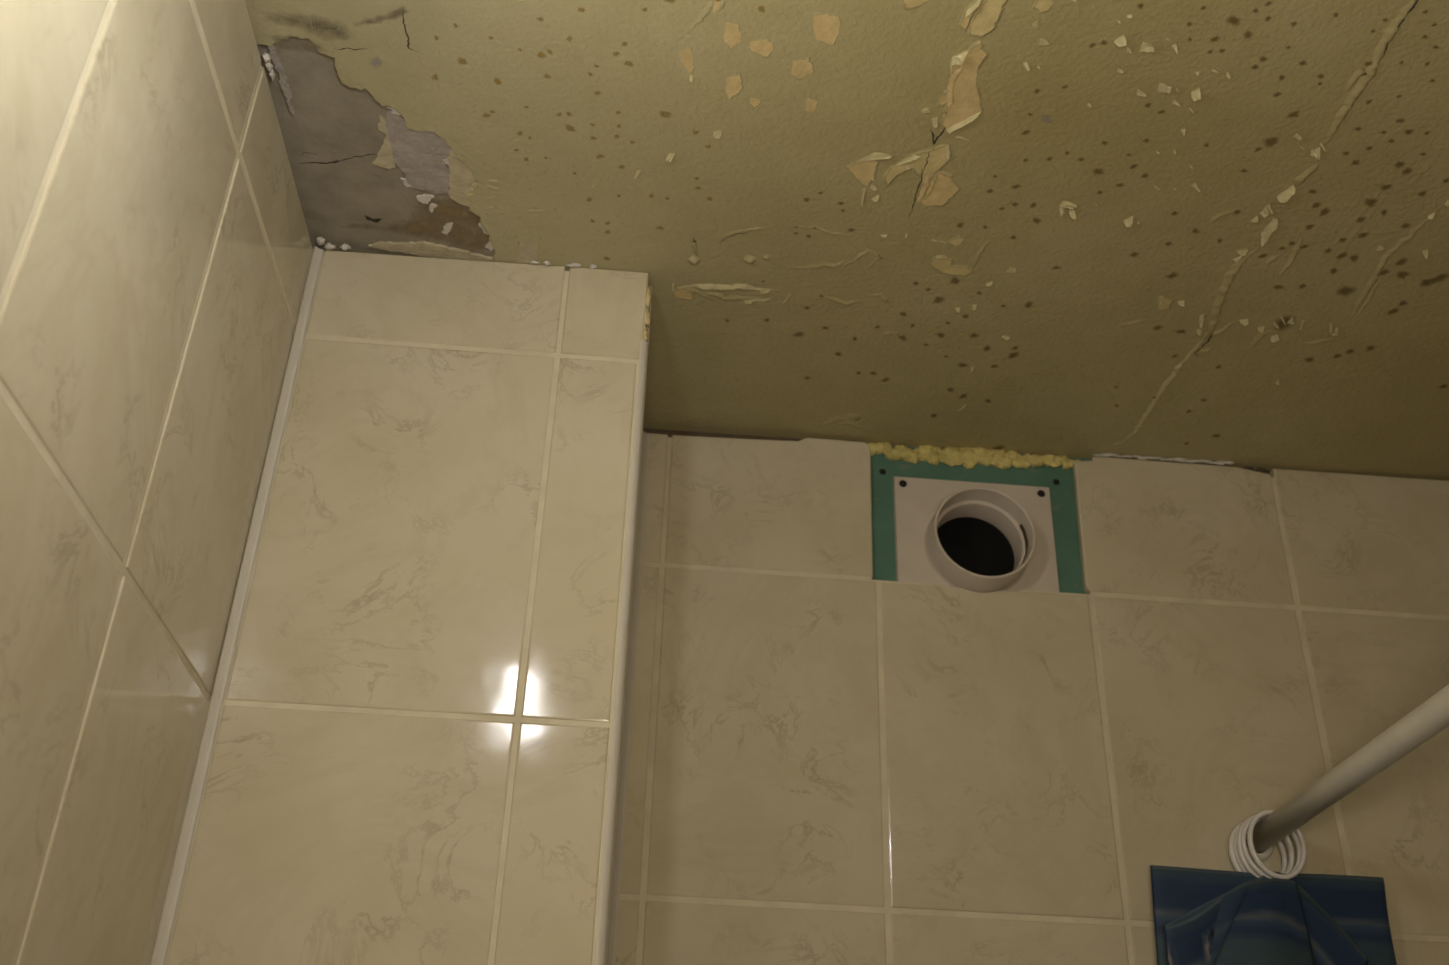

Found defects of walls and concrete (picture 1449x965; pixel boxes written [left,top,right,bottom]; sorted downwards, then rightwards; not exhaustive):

peeling [678,0,775,82]
peeling [810,12,842,45]
peeling [1114,14,1178,74]
peeling [846,0,1009,207]
peeling [1136,68,1231,113]
flaking render [257,37,495,262]
peeling [1059,201,1077,219]
crack [1101,0,1449,451]
peeling [670,283,791,304]